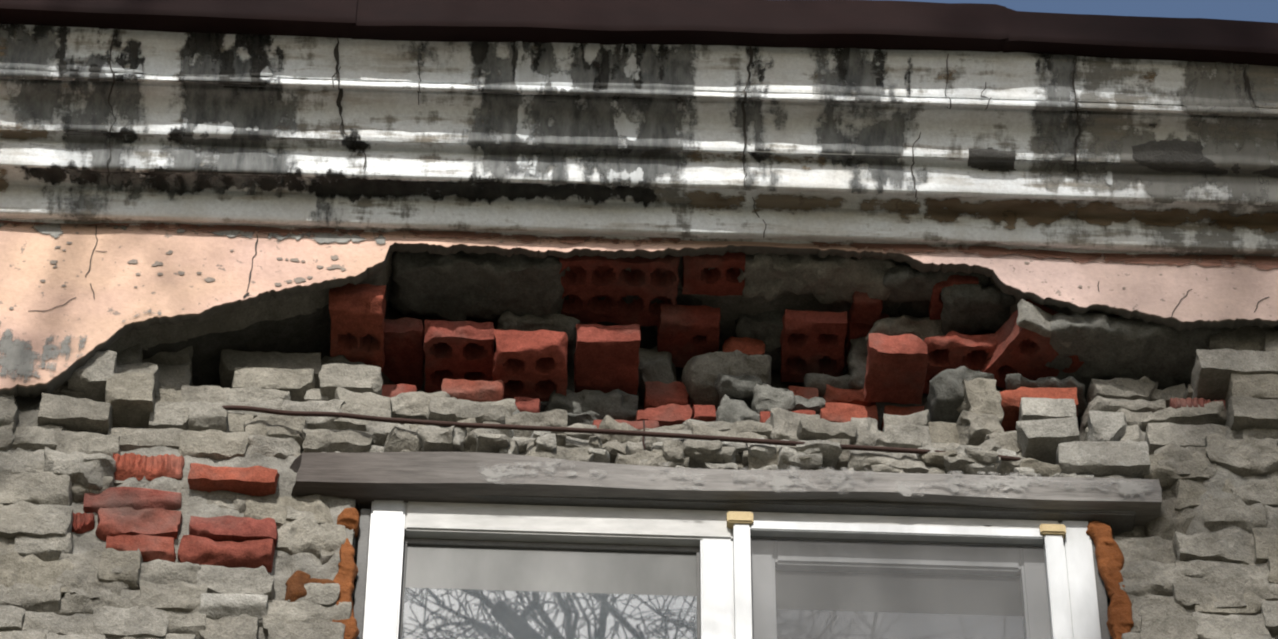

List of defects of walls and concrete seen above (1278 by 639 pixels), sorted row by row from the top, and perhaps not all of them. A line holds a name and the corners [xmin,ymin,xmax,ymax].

crack [332,36,366,170]
damp [0,23,927,224]
spalling [968,147,1016,171]
crack [1072,54,1081,176]
damp [1032,53,1278,207]
spalling [1131,124,1278,177]
peeling [0,329,87,383]
crack [31,226,107,311]
crack [243,234,258,298]
spalling [142,304,366,387]
spalling [213,225,1016,426]
spalling [875,312,1223,431]